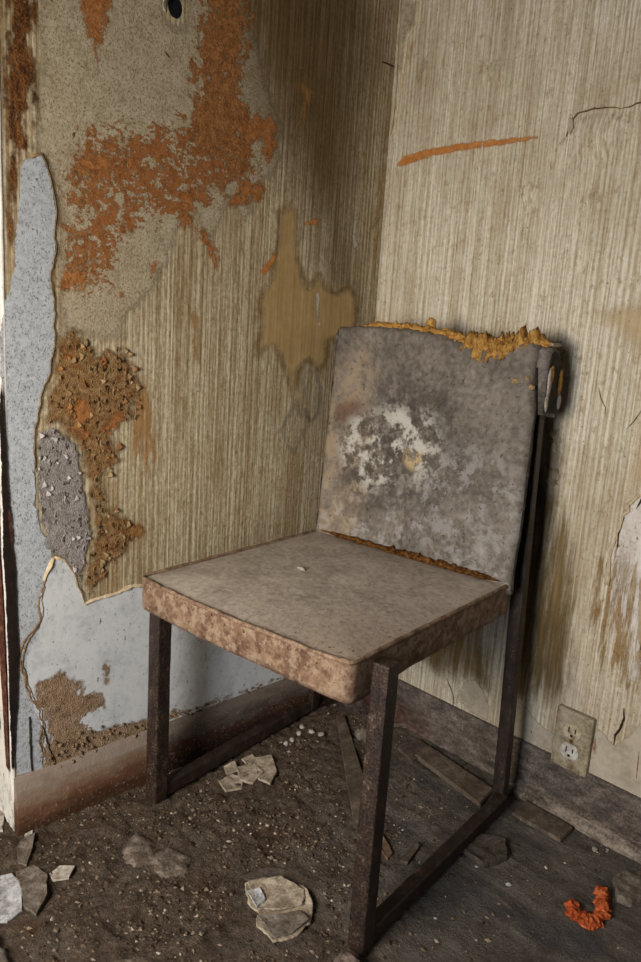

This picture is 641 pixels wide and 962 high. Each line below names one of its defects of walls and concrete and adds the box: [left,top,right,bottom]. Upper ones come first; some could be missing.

rust [397,137,538,166]
crack [566,102,641,137]
peeling [0,0,285,775]
leakage [255,206,358,389]
crack [0,386,57,772]
peeling [606,494,641,682]
peeling [588,724,641,798]